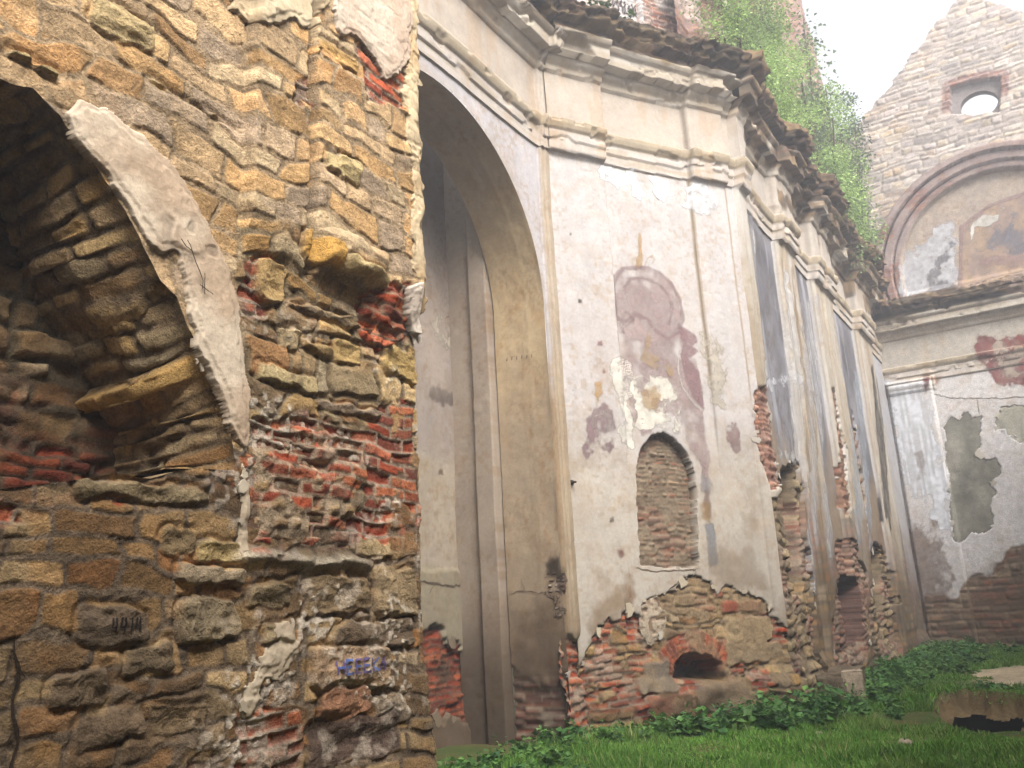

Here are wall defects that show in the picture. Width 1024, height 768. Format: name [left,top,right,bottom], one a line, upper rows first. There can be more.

flaking render [898,214,999,297]
flaking render [63,100,368,555]
flaking render [832,388,864,518]
flaking render [943,405,1024,543]
flaking render [559,370,824,732]
flaking render [422,626,466,728]